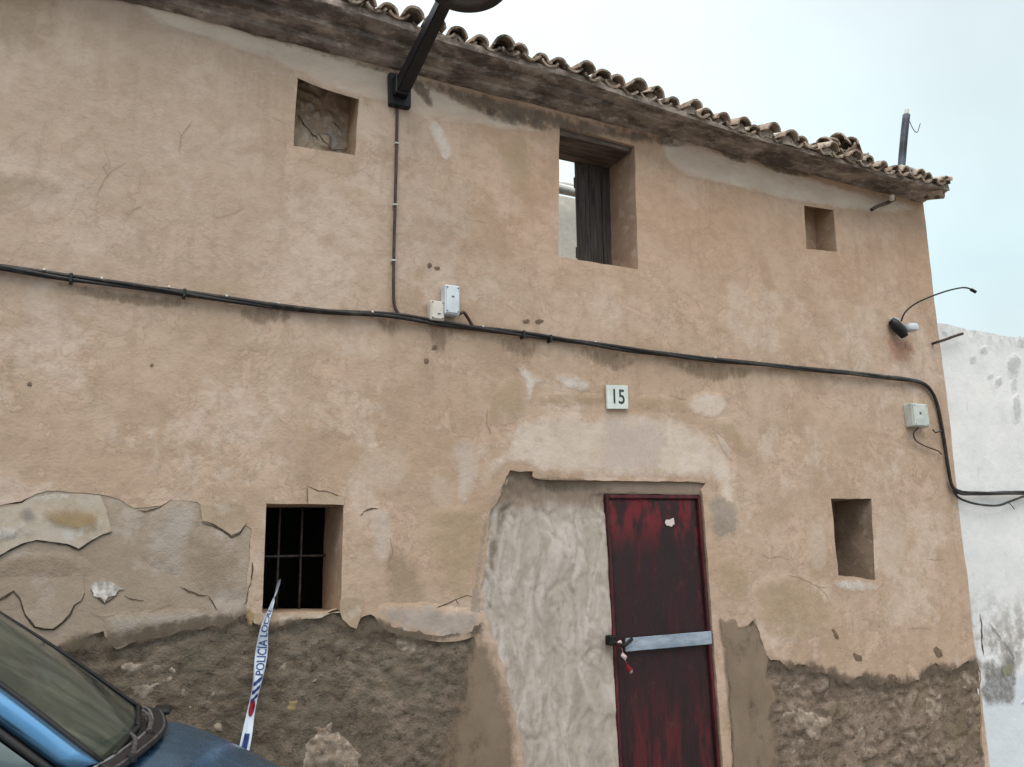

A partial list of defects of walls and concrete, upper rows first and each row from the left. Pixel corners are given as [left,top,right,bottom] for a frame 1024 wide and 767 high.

spalling [0,491,475,767]